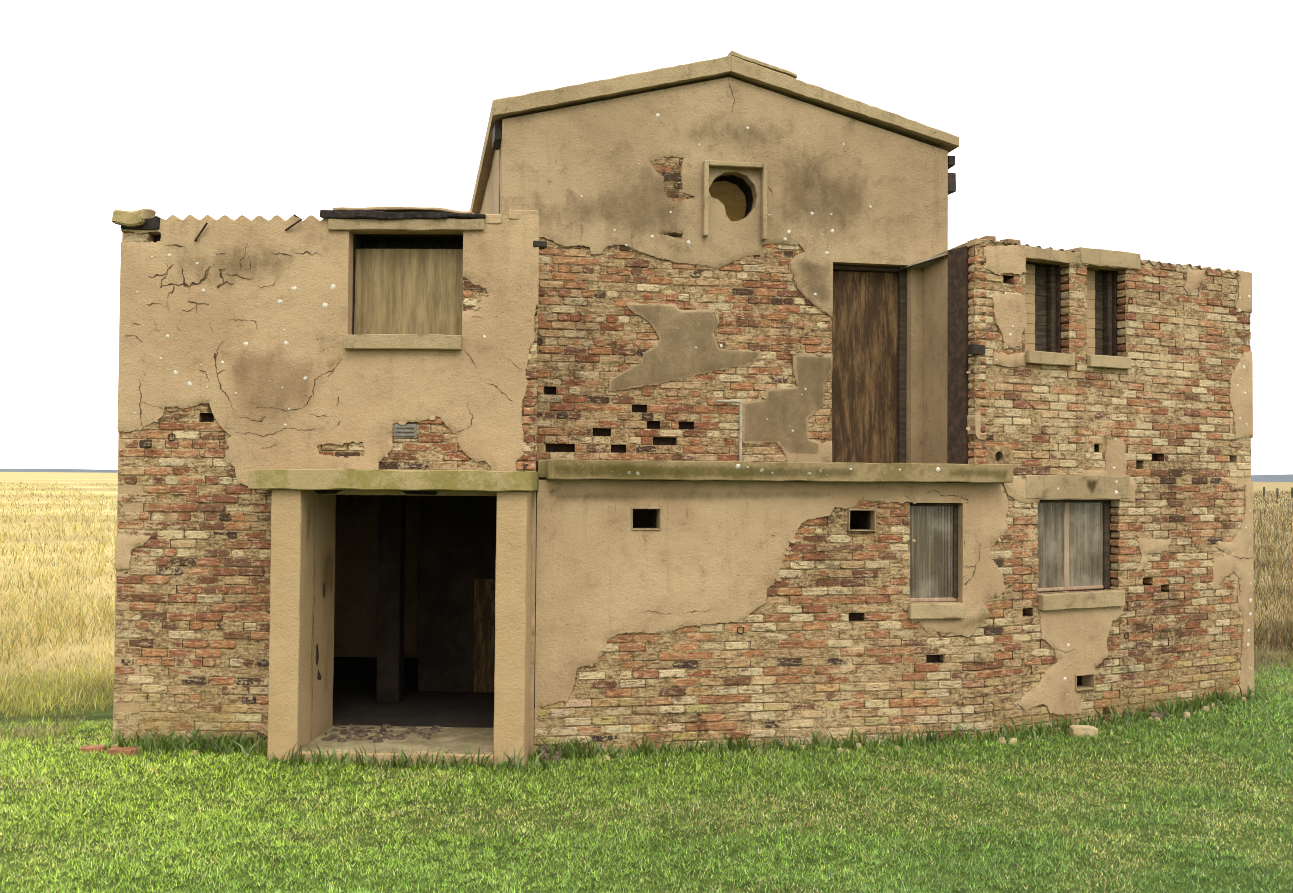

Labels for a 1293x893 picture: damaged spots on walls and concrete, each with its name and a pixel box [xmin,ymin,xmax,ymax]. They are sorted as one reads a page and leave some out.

flaking render [651,157,690,202]
flaking render [113,403,272,747]
crack [125,244,341,448]
flaking render [317,440,365,458]
flaking render [379,416,491,471]
flaking render [515,237,1251,753]